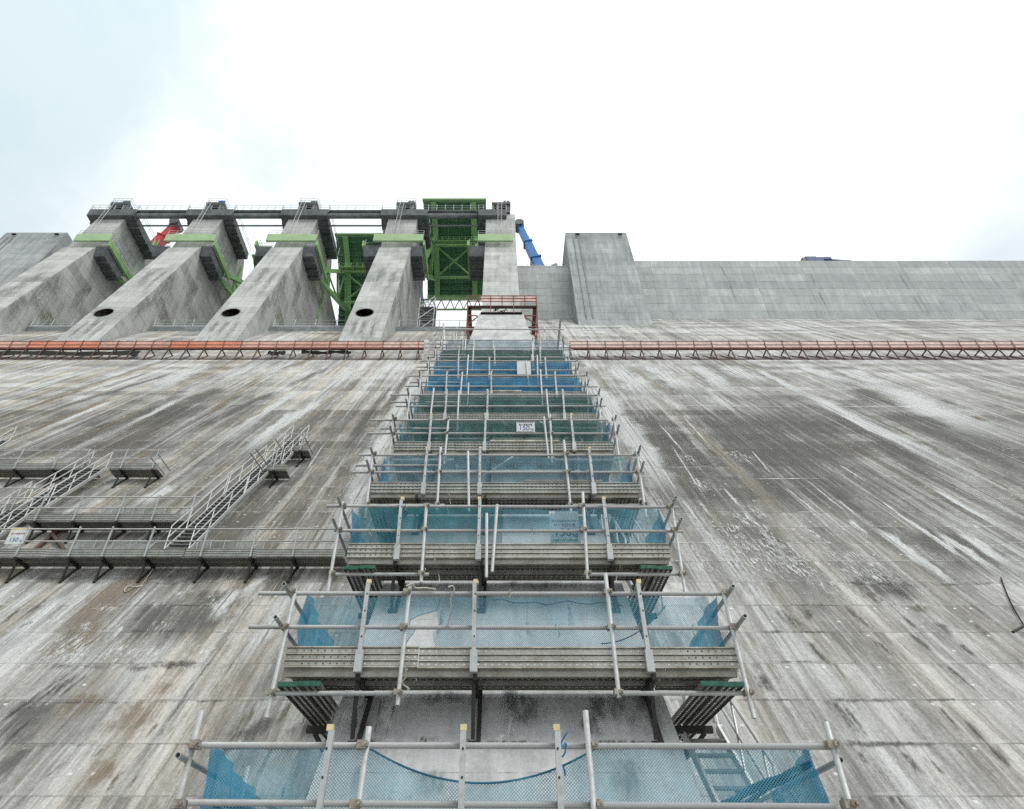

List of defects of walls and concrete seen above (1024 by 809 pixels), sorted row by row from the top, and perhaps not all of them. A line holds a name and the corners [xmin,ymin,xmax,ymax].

damp [12,361,294,462]
damp [138,486,176,503]
damp [200,368,356,484]
damp [583,365,1020,585]
damp [113,573,297,659]